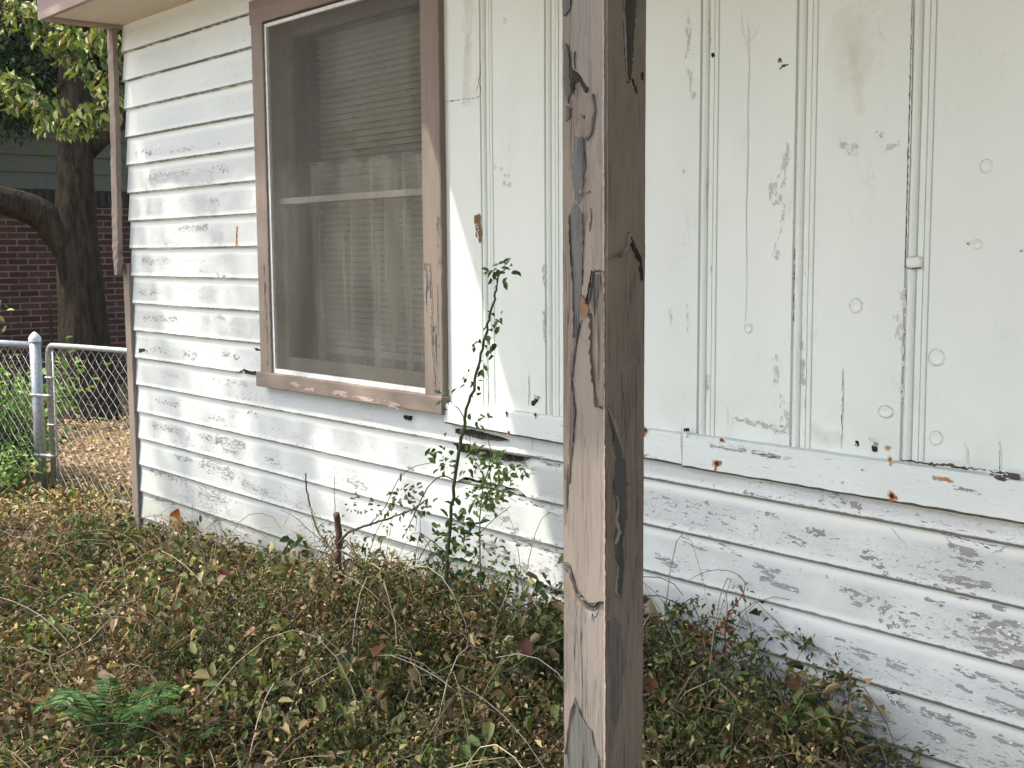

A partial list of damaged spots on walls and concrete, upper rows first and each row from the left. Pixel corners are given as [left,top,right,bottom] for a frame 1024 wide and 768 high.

peeling [622,0,636,84]
peeling [563,43,573,122]
crack [741,14,758,312]
peeling [468,136,645,729]
peeling [782,527,826,547]
peeling [753,562,799,594]
peeling [708,614,914,676]
peeling [839,586,916,639]
peeling [924,543,1024,667]
peeling [564,703,599,768]
peeling [833,690,978,746]
peeling [953,664,1024,717]